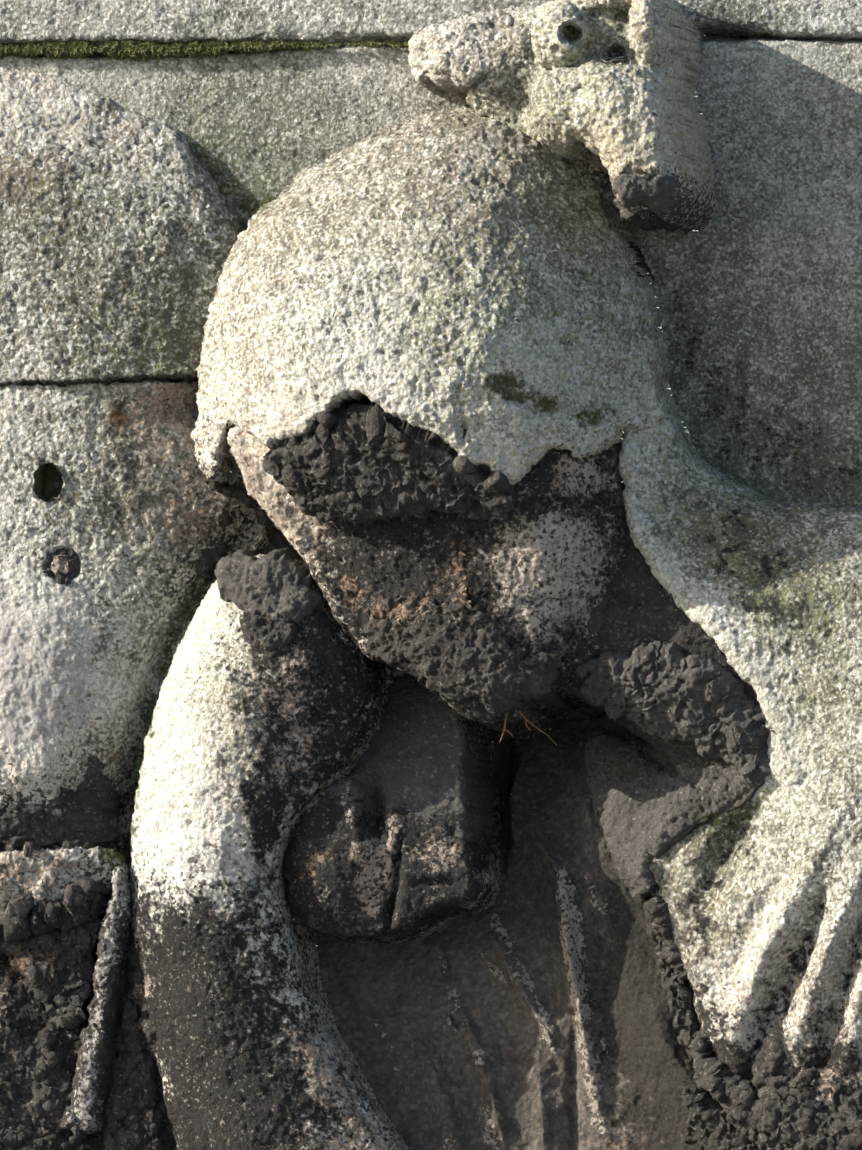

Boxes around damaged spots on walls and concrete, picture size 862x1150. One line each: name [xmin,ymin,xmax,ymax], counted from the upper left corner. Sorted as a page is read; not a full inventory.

spalling [228,436,325,547]
peeling [290,432,314,449]
peeling [420,437,484,487]
spalling [336,452,623,668]
spalling [239,615,327,791]
spalling [339,777,369,828]
spalling [350,812,461,922]
water stain [683,821,765,964]
water stain [66,870,130,1131]
water stain [690,931,821,1082]
water stain [804,937,862,1071]